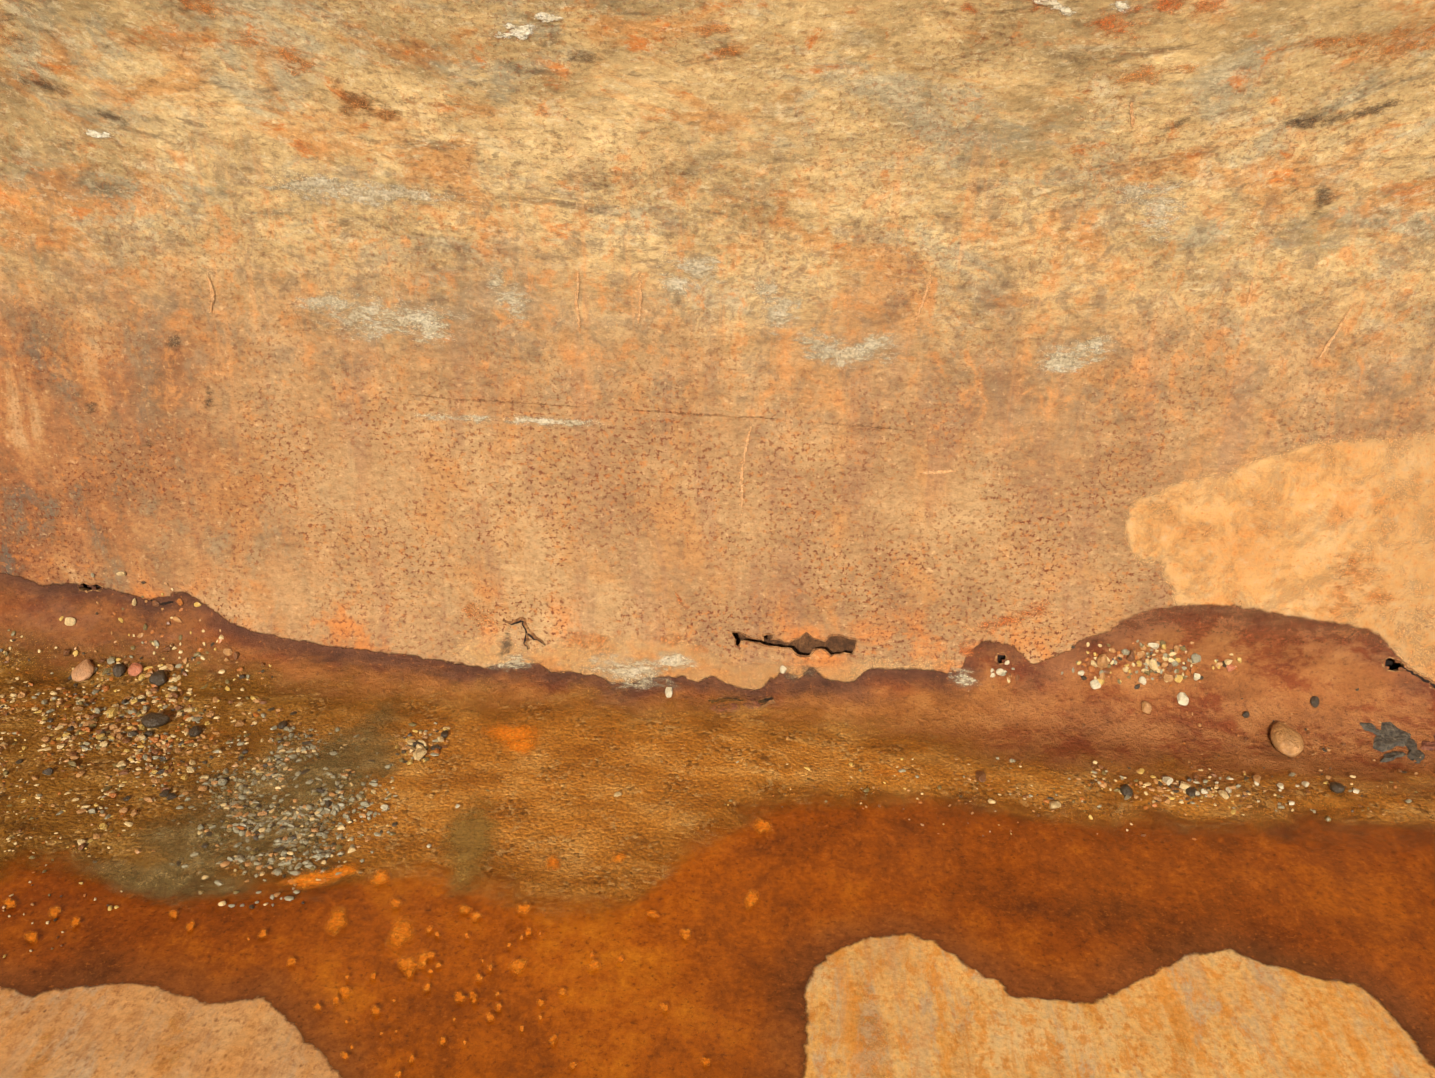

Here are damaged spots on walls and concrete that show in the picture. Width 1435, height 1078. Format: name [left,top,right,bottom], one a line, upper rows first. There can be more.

rust [1156,0,1224,11]
rust [341,91,398,120]
crack [502,617,546,650]
crack [1402,666,1435,688]
leakage [0,434,1435,1078]